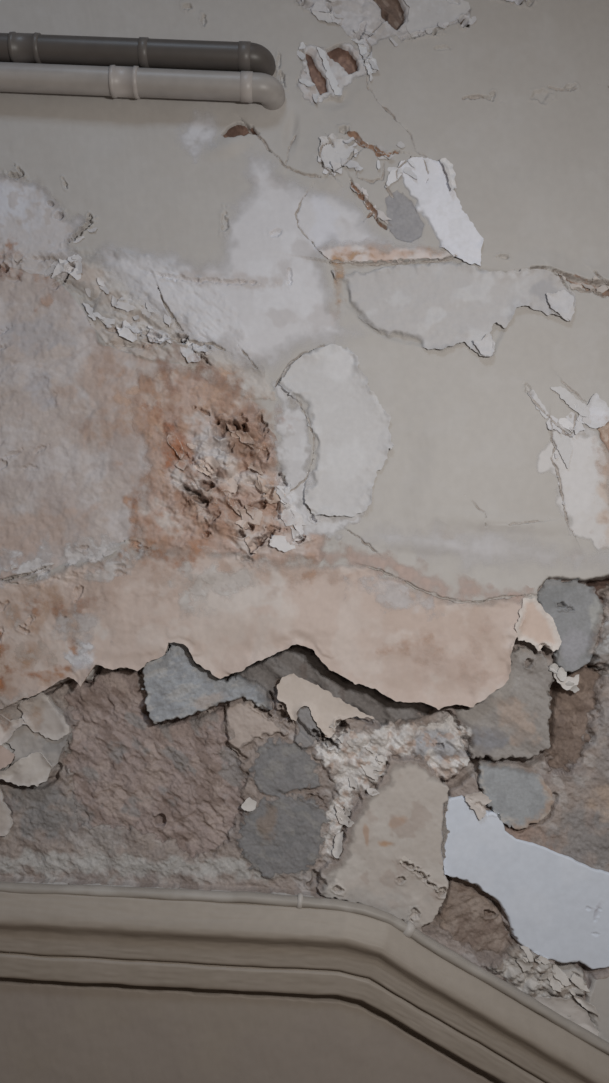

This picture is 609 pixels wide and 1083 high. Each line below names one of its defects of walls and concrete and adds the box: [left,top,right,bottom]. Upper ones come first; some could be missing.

spalling [297,0,476,103]
crack [246,27,457,266]
crack [530,266,609,298]
water stain [50,255,480,613]
crack [0,567,46,584]
water stain [0,535,142,582]
spalling [0,175,609,1036]
crack [347,530,532,604]